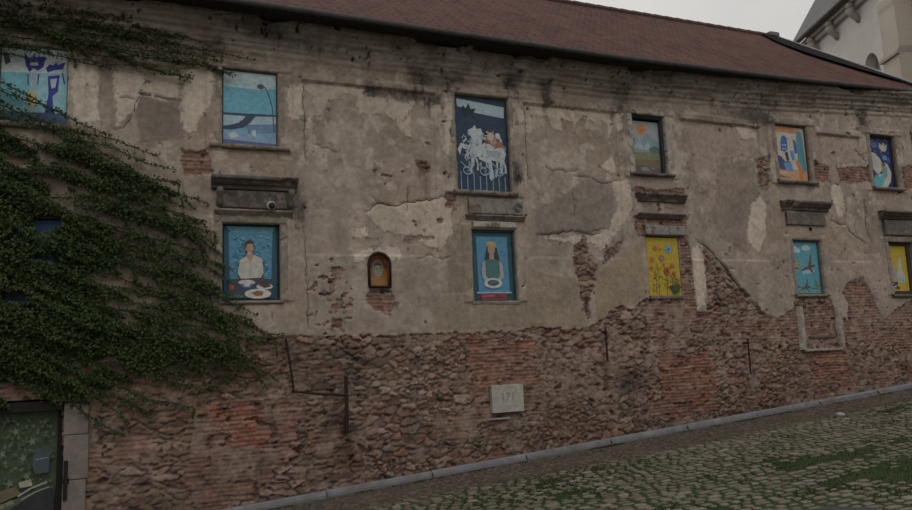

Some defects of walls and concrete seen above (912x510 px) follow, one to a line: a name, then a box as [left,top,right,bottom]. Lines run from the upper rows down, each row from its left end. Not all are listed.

spalling [179,147,221,182]
peeling [307,193,457,332]
crack [366,195,441,212]
crack [523,105,616,243]
peeling [542,155,707,322]
spalling [839,247,891,328]
flaking render [808,346,850,387]